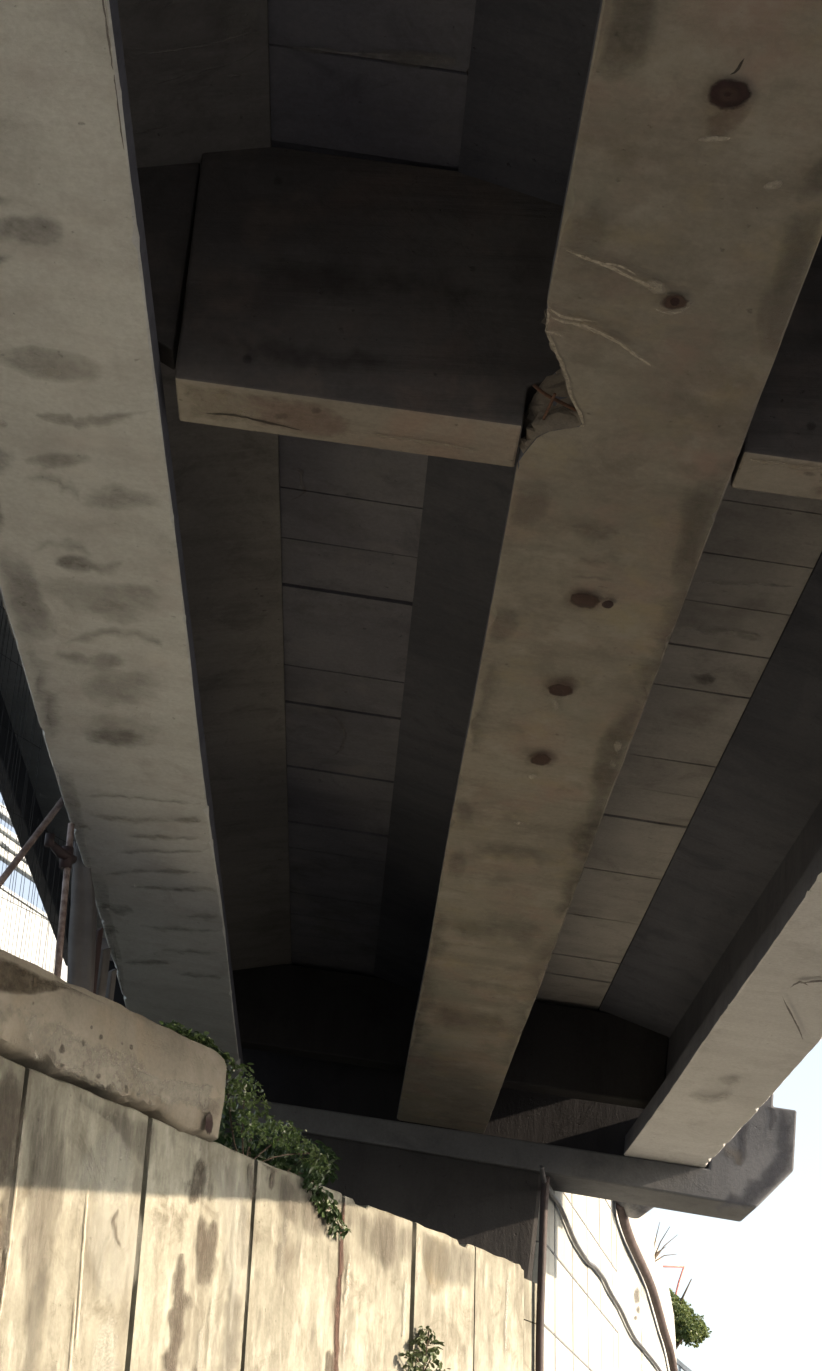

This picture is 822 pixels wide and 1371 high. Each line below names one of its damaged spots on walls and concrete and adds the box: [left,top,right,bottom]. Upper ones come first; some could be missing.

corrosion [709,59,752,109]
crack [565,249,654,289]
corrosion [649,281,689,314]
crack [545,308,651,366]
spalling [519,309,585,453]
corrosion [571,593,614,608]
corrosion [548,684,573,706]
crack [783,980,822,1039]
damp [0,1072,57,1290]
damp [190,1160,212,1202]
damp [724,1107,791,1207]
damp [166,1219,218,1371]